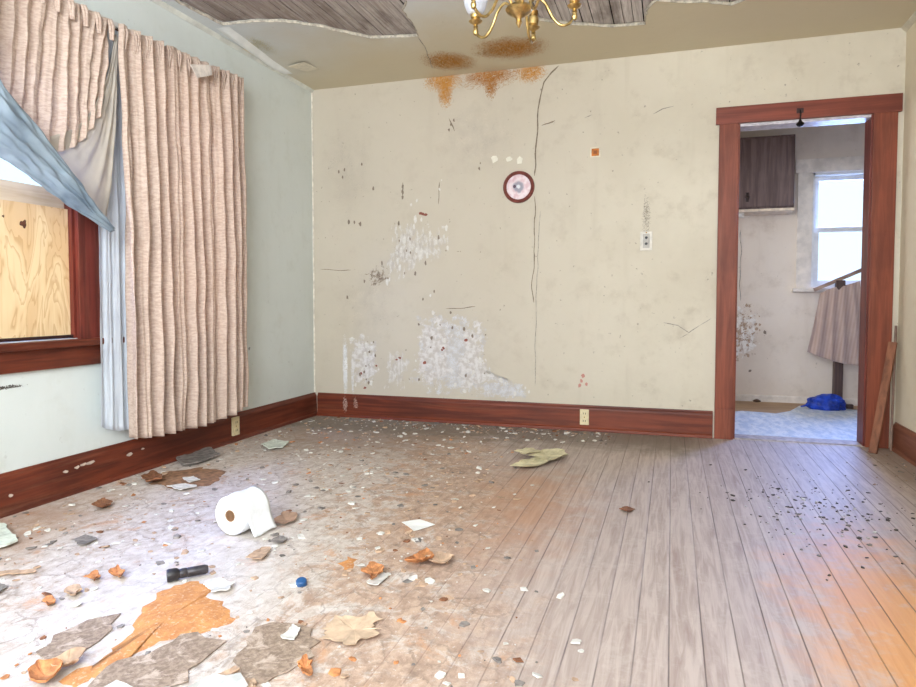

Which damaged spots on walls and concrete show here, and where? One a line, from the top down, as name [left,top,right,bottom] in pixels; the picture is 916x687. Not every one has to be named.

flaking render [175,0,419,39]
flaking render [528,0,745,27]
rust [418,36,549,107]
peeling [364,185,449,286]
crack [531,66,558,381]
peeling [349,311,530,398]
peeling [736,303,766,361]